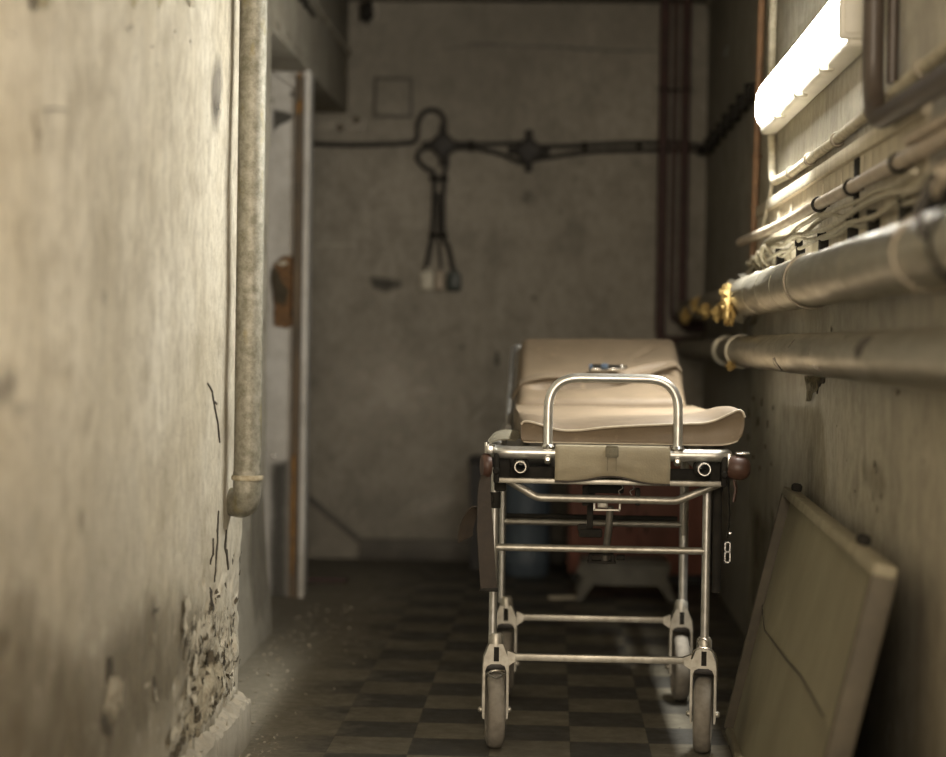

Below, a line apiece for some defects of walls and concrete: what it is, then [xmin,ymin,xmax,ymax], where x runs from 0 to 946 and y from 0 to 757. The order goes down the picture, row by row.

crack [207,383,221,443]
peeling [804,375,826,401]
crack [209,511,229,614]
spalling [169,583,240,757]